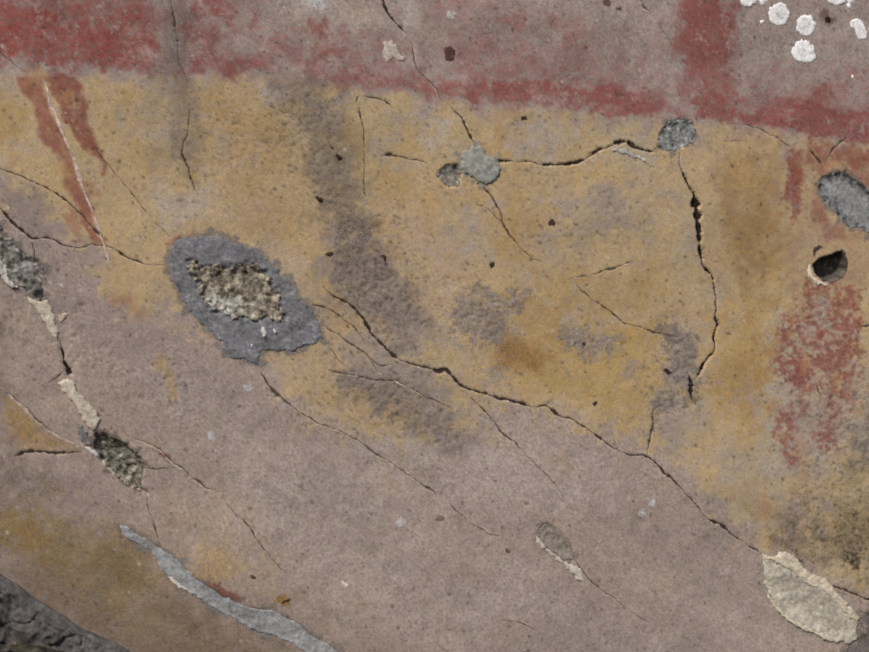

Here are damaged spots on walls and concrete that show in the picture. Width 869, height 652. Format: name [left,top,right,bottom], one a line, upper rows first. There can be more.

crack [382,0,475,143]
spalling [437,164,461,187]
crack [498,140,658,166]
crack [0,168,161,267]
spalling [0,223,48,301]
crack [679,151,718,401]
spalling [807,245,829,287]
crack [49,344,72,382]
crack [7,393,82,456]
crack [313,287,761,553]
spalling [77,425,147,493]
spalling [536,523,584,582]